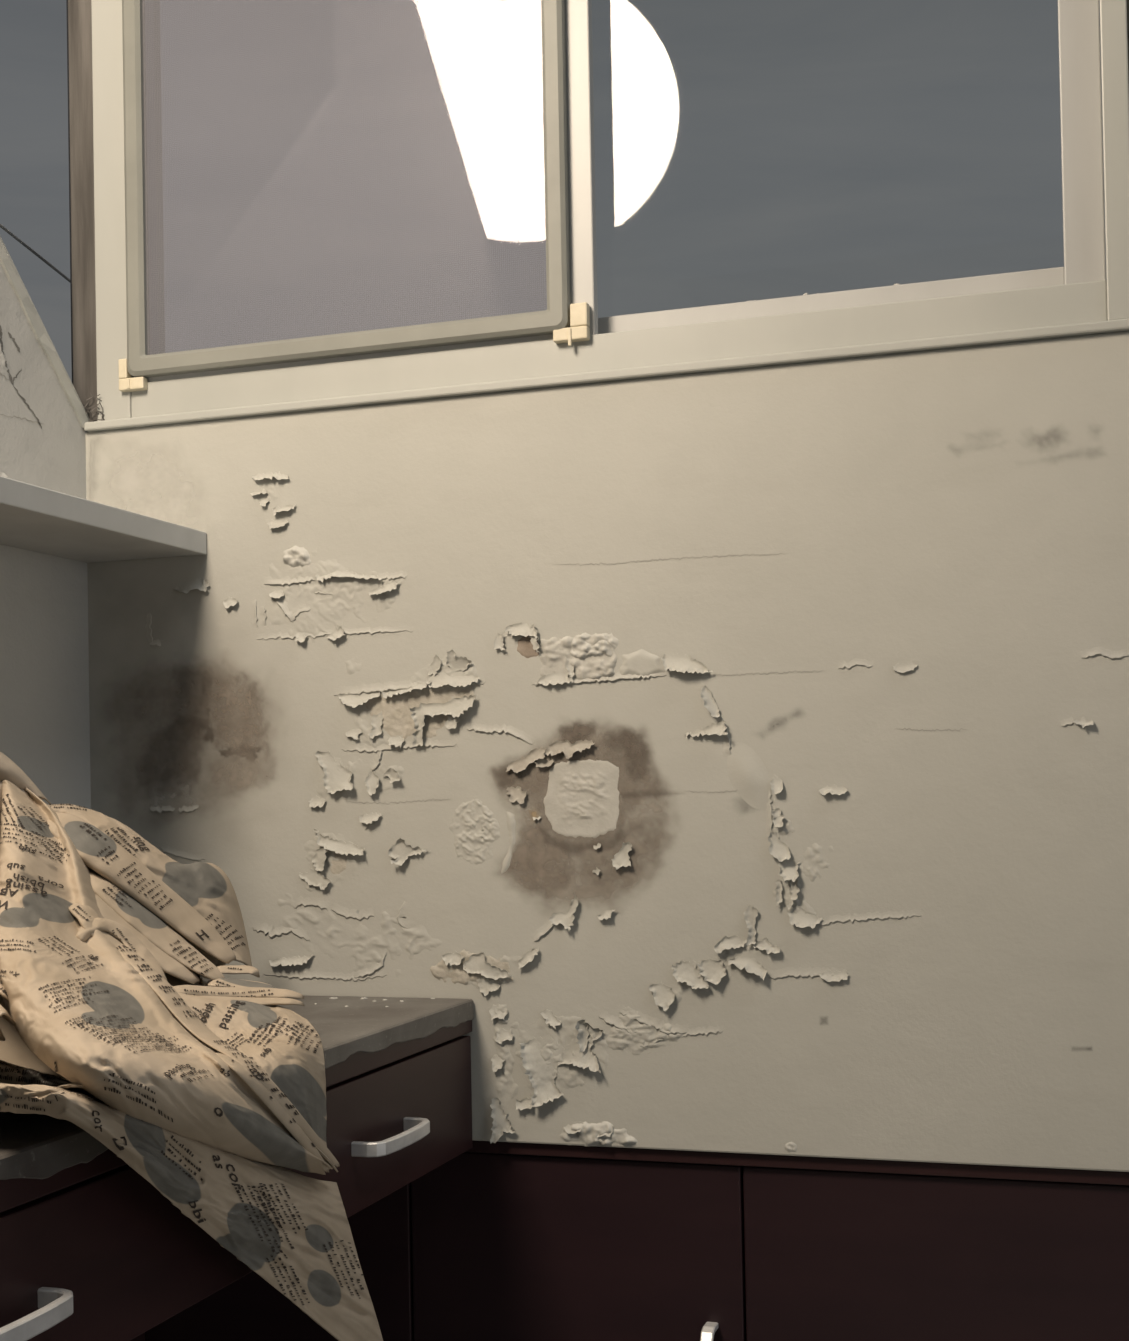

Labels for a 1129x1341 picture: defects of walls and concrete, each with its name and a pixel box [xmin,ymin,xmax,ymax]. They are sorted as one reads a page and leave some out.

crack [0,325,42,429]
peeling [250,471,295,530]
peeling [223,546,413,645]
peeling [308,650,485,808]
spalling [494,623,822,758]
peeling [893,661,917,673]
peeling [299,829,368,895]
peeling [359,812,382,830]
peeling [388,838,430,866]
leakage [467,722,663,900]
peeling [765,774,921,929]
peeling [430,893,849,1146]